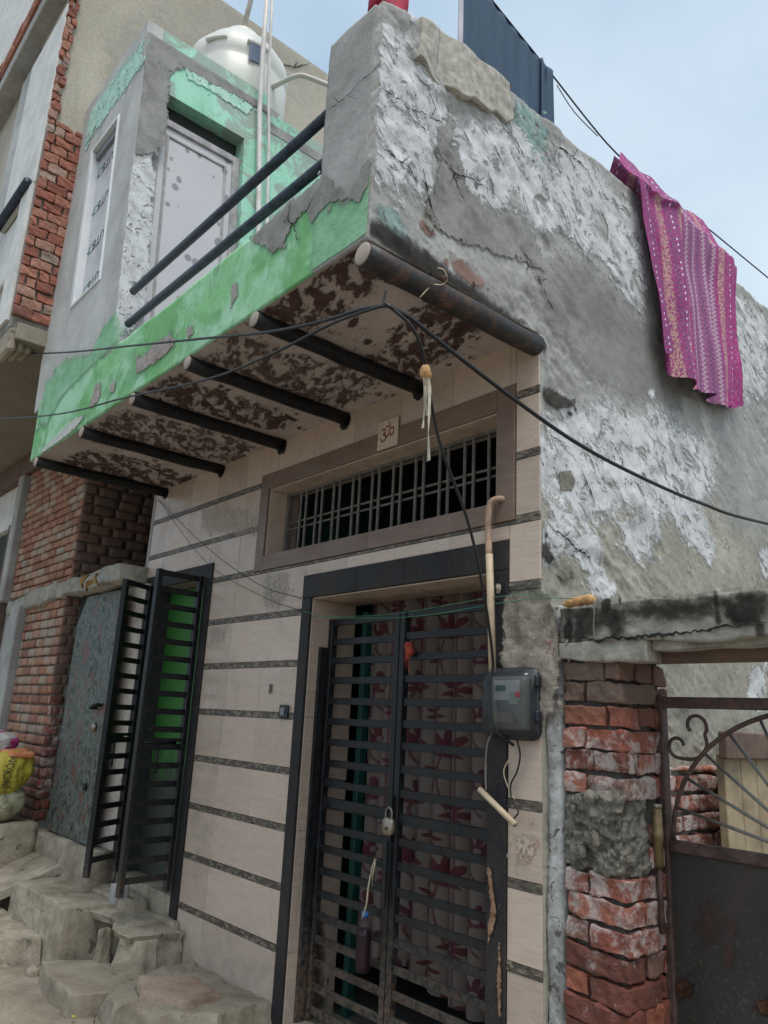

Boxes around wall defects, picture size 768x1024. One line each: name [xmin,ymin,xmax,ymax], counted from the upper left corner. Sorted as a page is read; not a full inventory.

flaking render [136,32,280,157]
rust [370,220,528,325]
peeling [249,12,718,601]
crack [521,246,555,313]
peeling [135,326,193,373]
peeling [201,333,395,412]
peeling [759,546,768,579]
crack [561,622,767,644]
water stain [563,591,768,642]